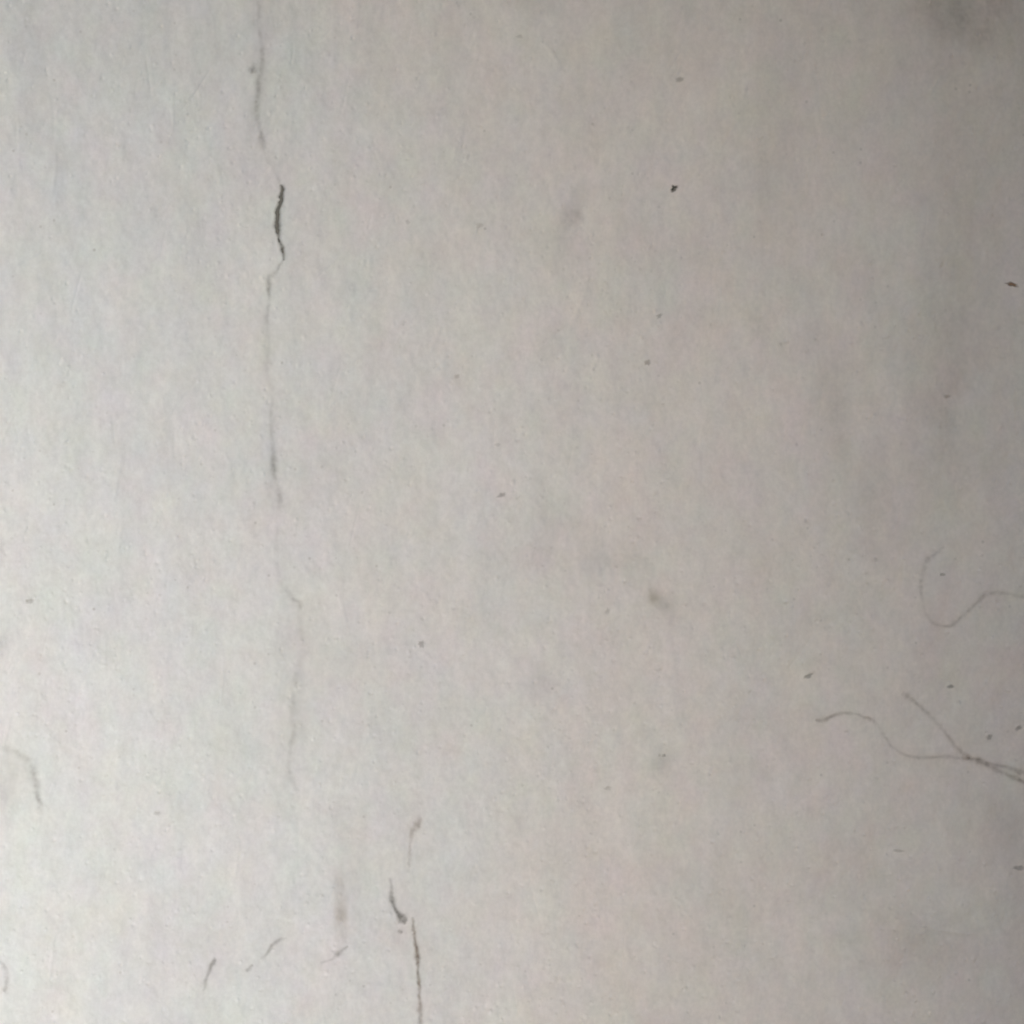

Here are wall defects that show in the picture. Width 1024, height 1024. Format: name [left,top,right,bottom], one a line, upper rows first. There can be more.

crack [275,185,284,253]